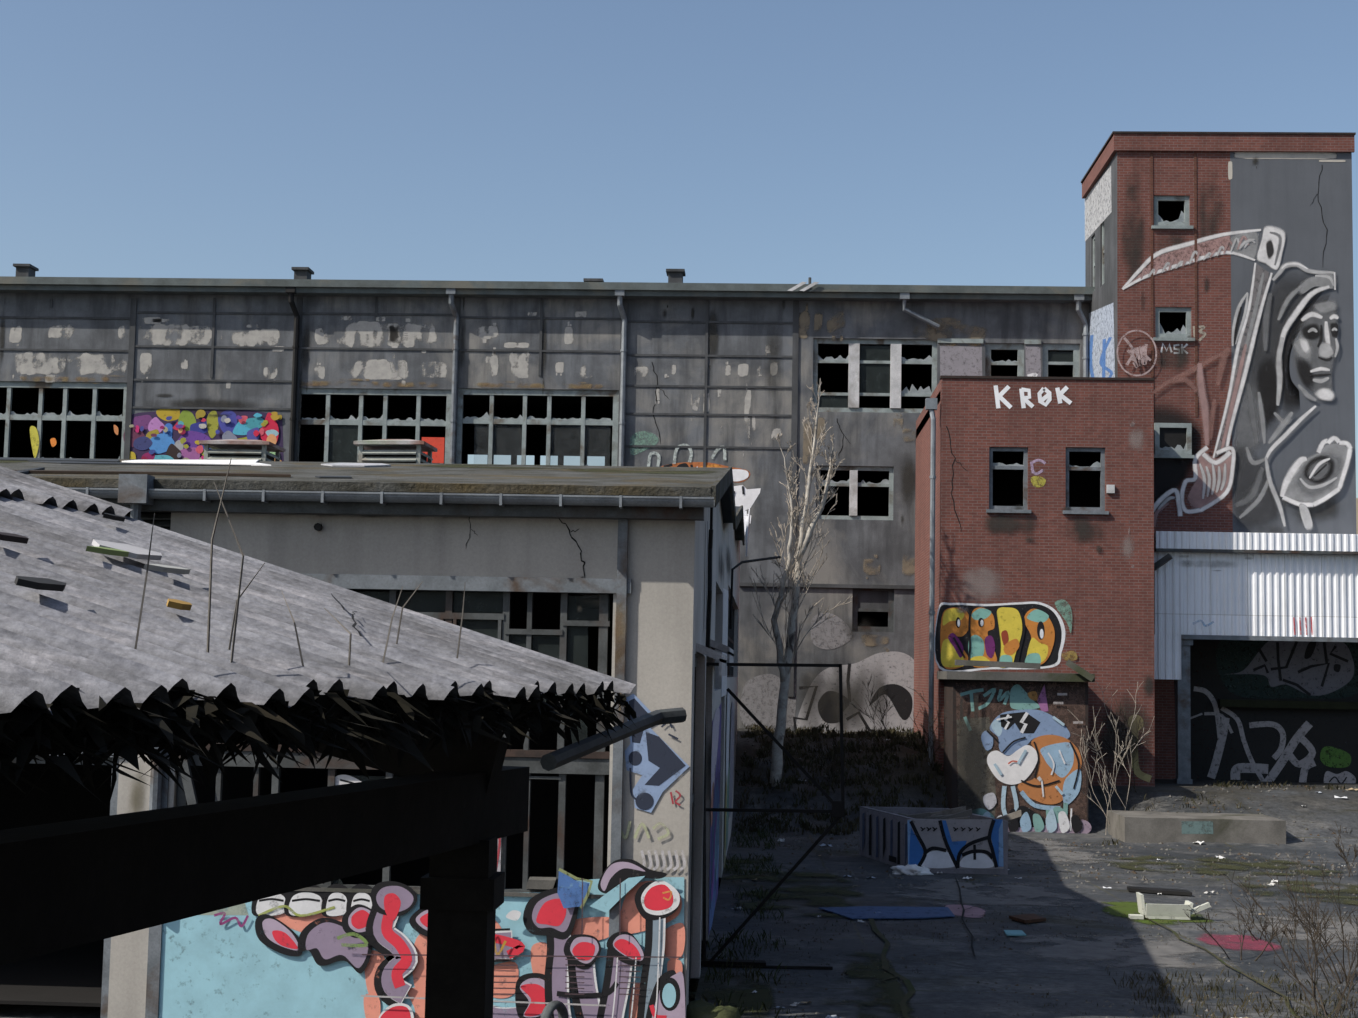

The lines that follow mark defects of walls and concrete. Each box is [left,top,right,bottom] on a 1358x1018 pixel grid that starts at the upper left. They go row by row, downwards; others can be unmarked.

peeling [9,317,212,383]
peeling [232,325,284,352]
peeling [314,316,447,385]
peeling [478,323,530,378]
peeling [564,311,587,344]
crack [559,519,585,577]